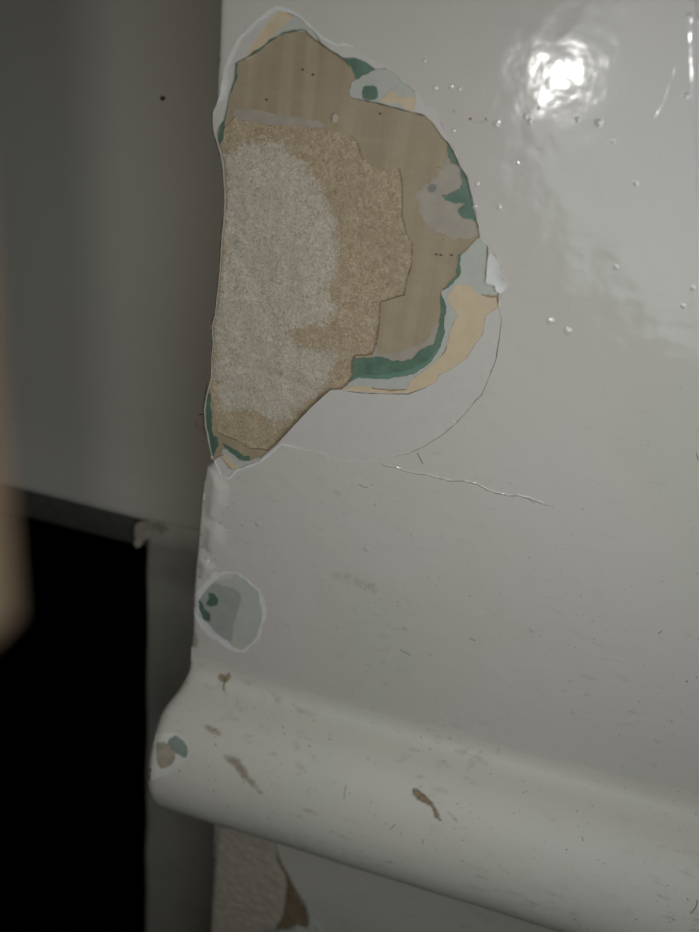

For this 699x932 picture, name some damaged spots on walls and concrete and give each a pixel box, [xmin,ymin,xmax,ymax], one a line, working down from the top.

peeling [196,6,508,480]
crack [380,461,553,506]
peeling [194,571,267,653]
peeling [211,825,321,932]